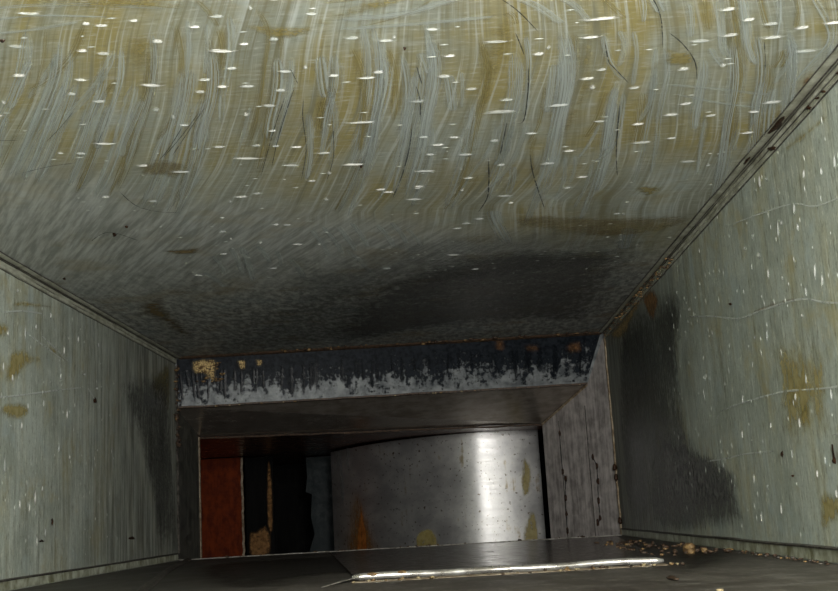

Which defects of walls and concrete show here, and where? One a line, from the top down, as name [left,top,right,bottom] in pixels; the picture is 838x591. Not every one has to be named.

water stain [3,352,28,379]
corrosion [193,360,225,383]
water stain [781,353,832,428]
water stain [4,404,29,428]